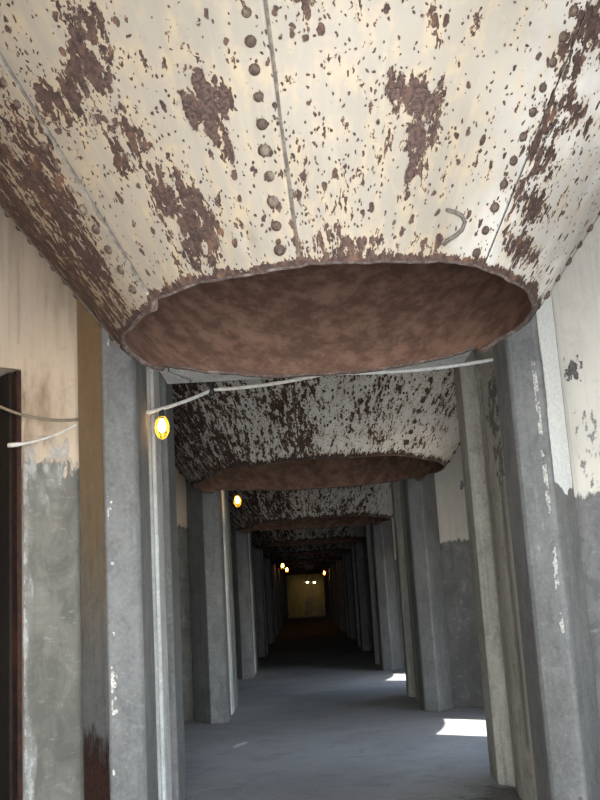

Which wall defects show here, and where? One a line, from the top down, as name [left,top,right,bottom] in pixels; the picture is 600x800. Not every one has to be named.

rust [58,5,85,46]
rust [588,0,600,52]
rust [78,59,127,133]
rust [180,67,235,165]
rust [385,65,446,194]
rust [509,33,581,269]
rust [153,183,217,271]
peeling [531,292,597,514]
rust [83,729,110,800]